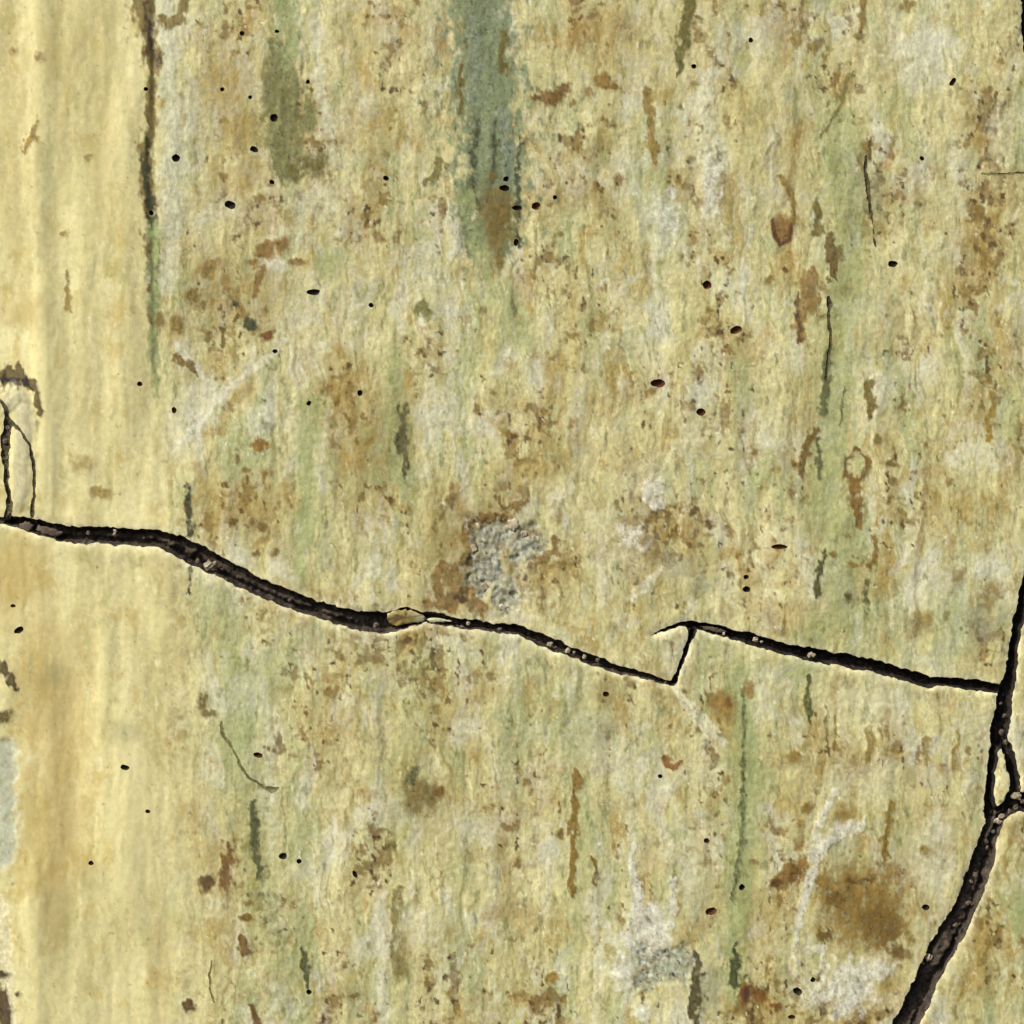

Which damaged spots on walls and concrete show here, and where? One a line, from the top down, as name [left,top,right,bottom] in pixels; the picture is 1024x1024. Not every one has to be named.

damp [449,11,527,287]
corrosion [767,172,799,253]
spalling [458,503,558,623]
crack [0,399,1024,1024]